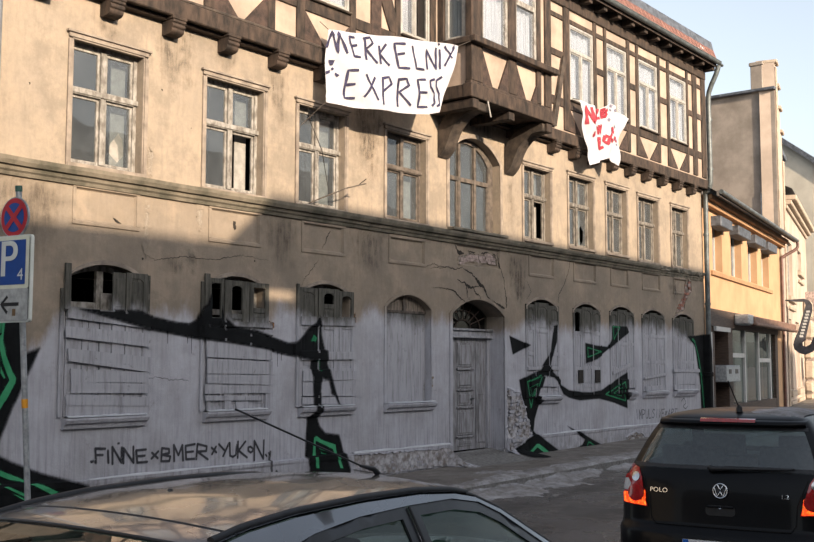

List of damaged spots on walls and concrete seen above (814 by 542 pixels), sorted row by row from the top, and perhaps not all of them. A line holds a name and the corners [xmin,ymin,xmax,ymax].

crack [426,245,507,309]
flaking render [457,251,497,267]
flaking render [506,386,533,455]